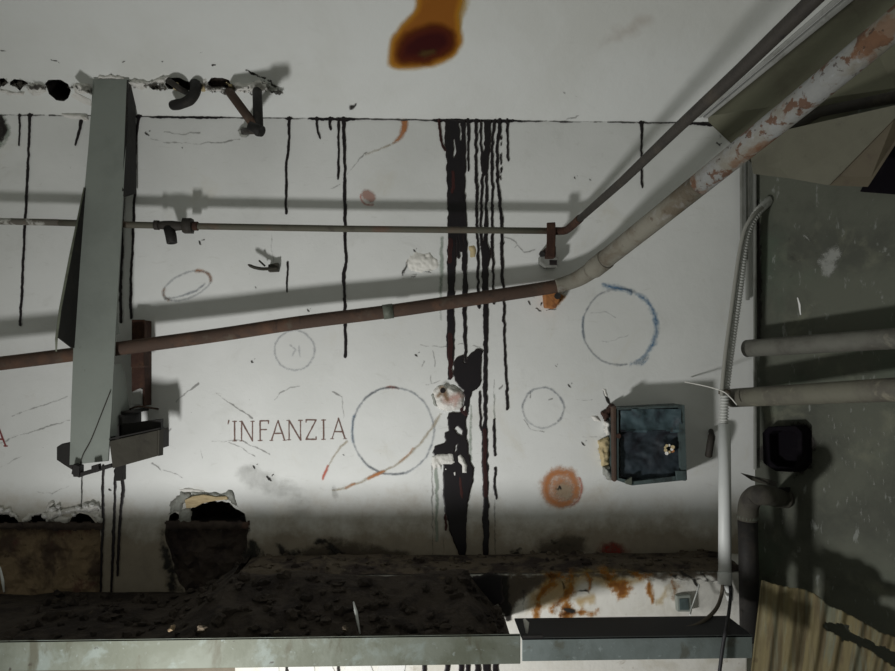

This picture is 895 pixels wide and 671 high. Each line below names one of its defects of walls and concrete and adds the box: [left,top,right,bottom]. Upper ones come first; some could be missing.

spalling [0,74,190,106]
spalling [201,69,283,95]
crack [142,115,572,123]
crack [608,121,720,146]
leakage [0,113,31,326]
leakage [315,116,348,310]
leakage [438,118,509,296]
spalling [431,385,466,411]
leakage [432,301,509,555]
spalling [0,501,104,595]
spalling [160,488,264,592]
corrosion [514,567,717,618]